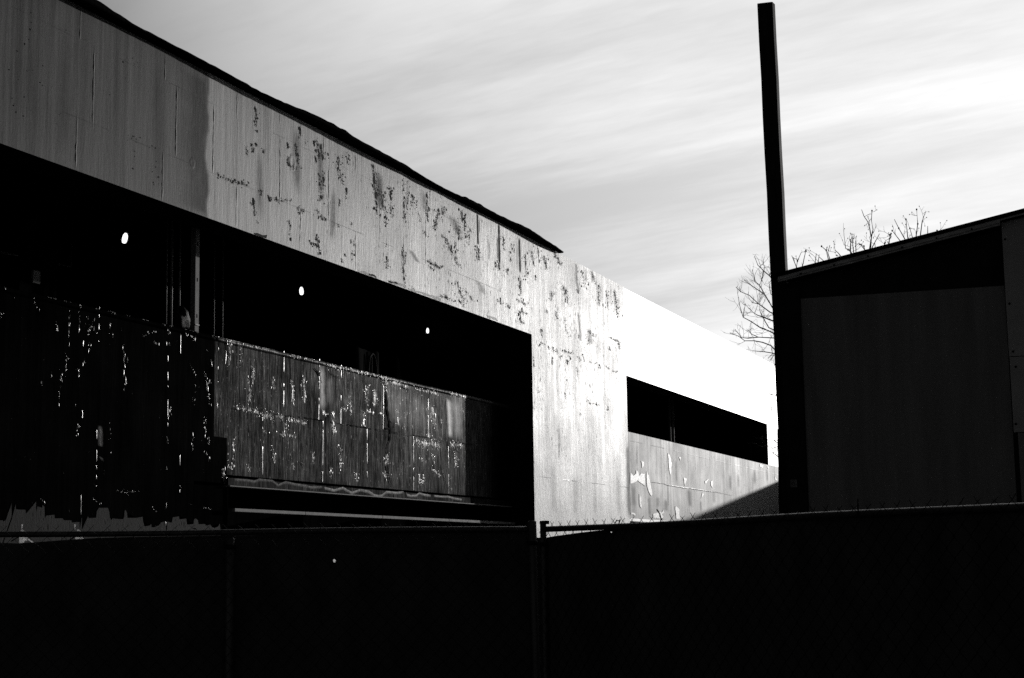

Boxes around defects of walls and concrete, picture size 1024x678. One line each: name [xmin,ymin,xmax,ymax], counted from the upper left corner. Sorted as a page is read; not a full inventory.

peeling [217,173,305,241]
peeling [287,127,351,221]
peeling [359,164,481,304]
peeling [495,237,563,325]
peeling [533,270,623,377]
peeling [236,368,306,463]
peeling [322,364,437,476]
peeling [630,461,652,515]